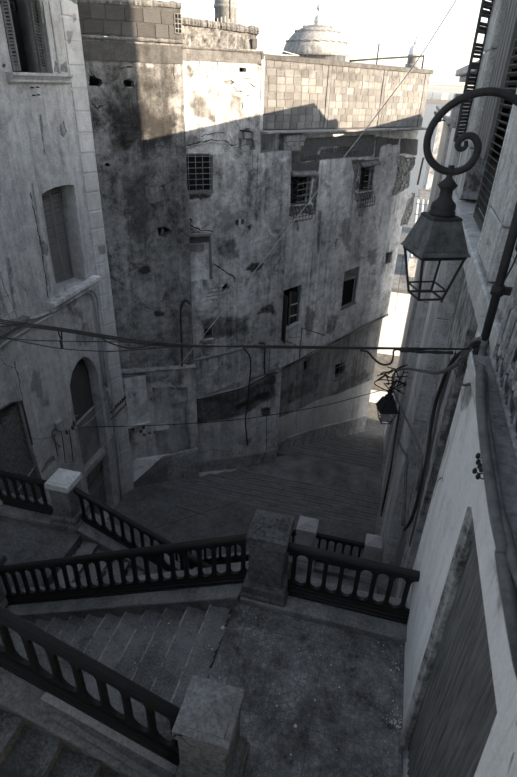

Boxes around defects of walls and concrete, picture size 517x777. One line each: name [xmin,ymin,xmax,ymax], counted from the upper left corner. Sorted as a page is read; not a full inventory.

leakage [115,103,176,149]
spalling [238,130,255,152]